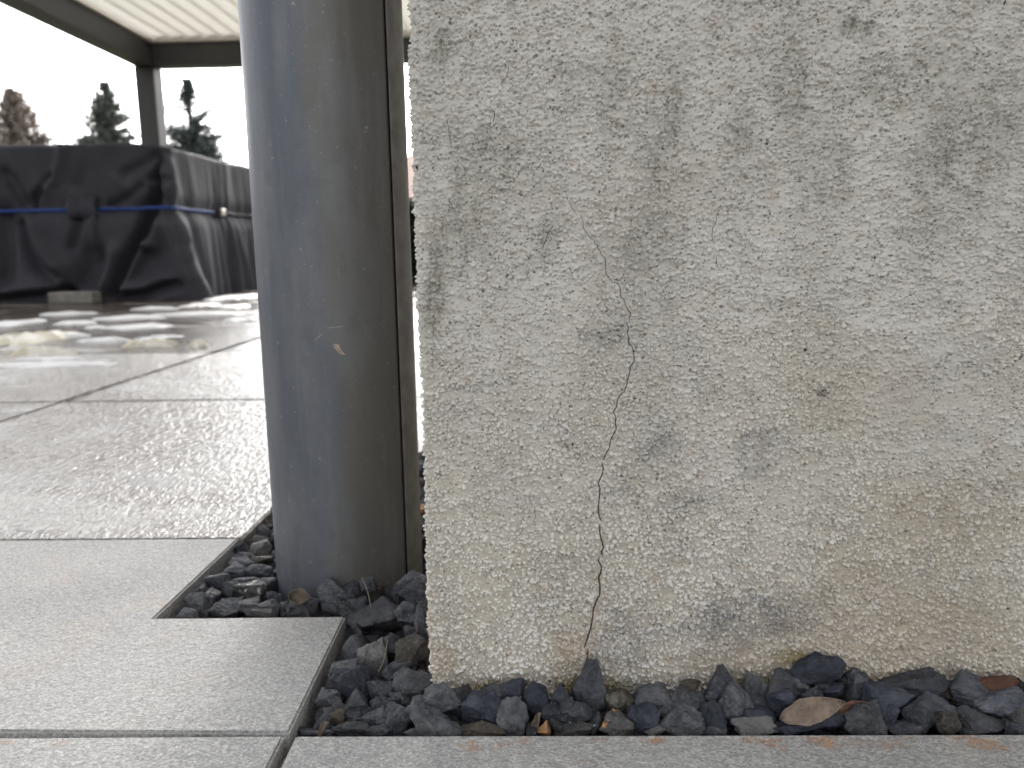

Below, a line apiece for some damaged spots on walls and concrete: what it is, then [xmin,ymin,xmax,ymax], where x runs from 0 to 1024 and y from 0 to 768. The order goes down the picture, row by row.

crack [564,191,635,660]